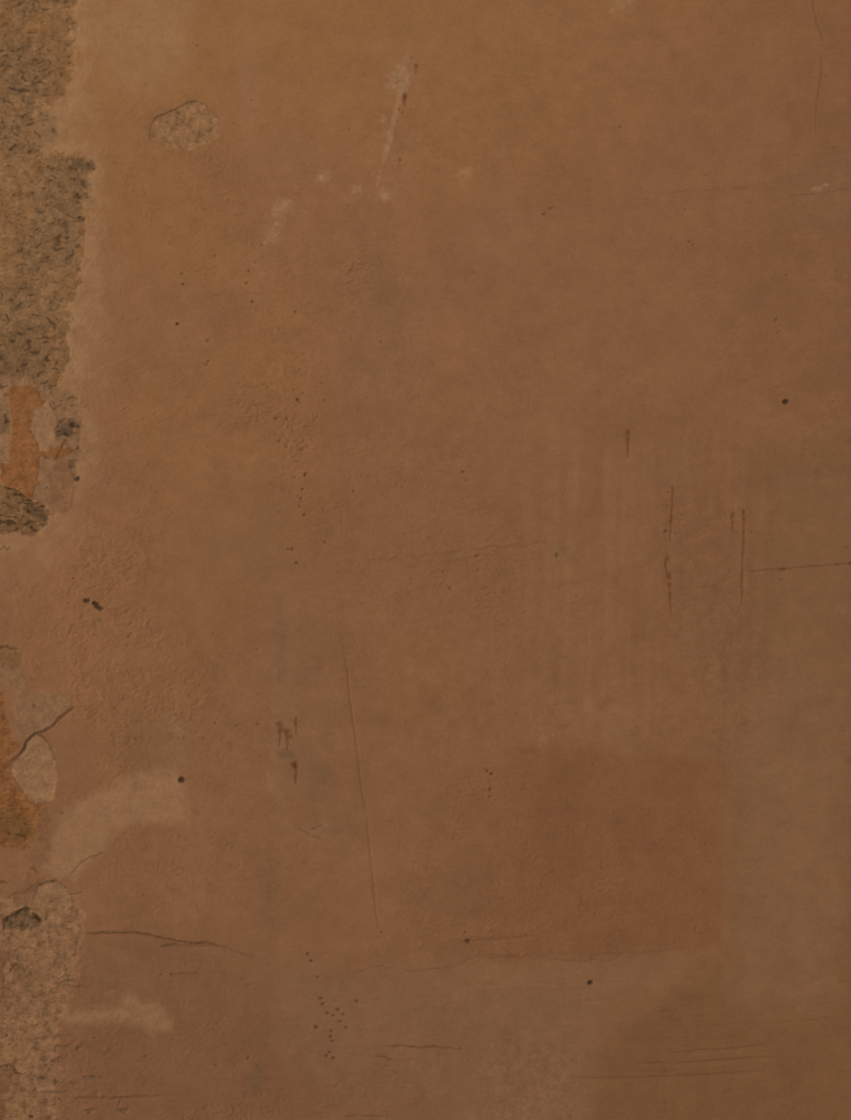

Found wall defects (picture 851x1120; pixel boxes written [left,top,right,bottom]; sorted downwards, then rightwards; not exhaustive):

flaking render [0,0,99,552]
crack [10,707,75,763]
flaking render [0,692,87,1120]
crack [86,931,254,960]